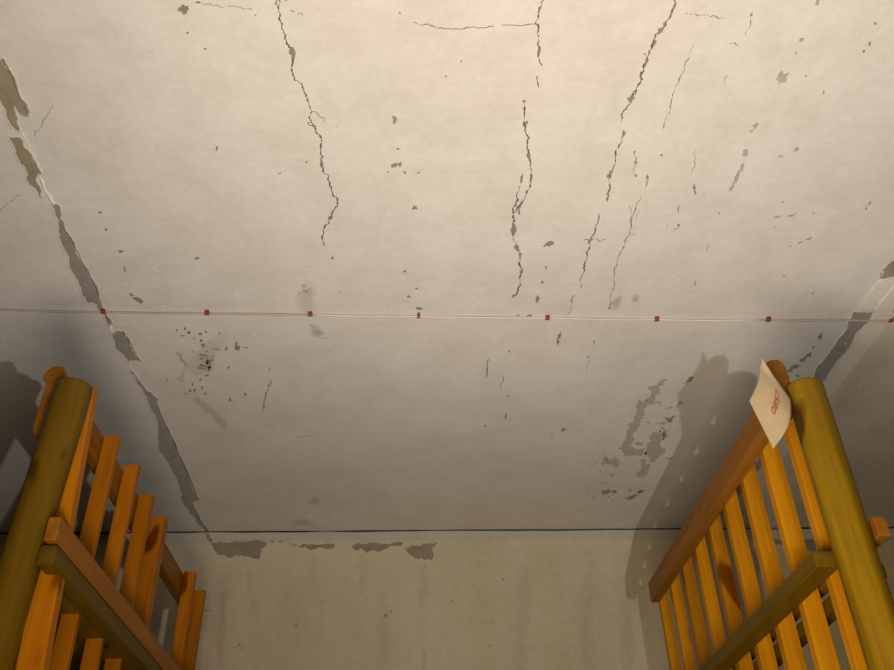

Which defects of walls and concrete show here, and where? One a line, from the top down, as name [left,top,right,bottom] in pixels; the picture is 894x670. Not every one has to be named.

crack [178,1,256,34]
crack [275,0,339,260]
crack [415,0,544,298]
crack [557,0,723,345]
flaking render [0,56,335,559]
flaking render [787,310,875,382]
flaking render [880,260,894,279]
peeling [587,376,694,502]
flaking render [352,542,437,560]